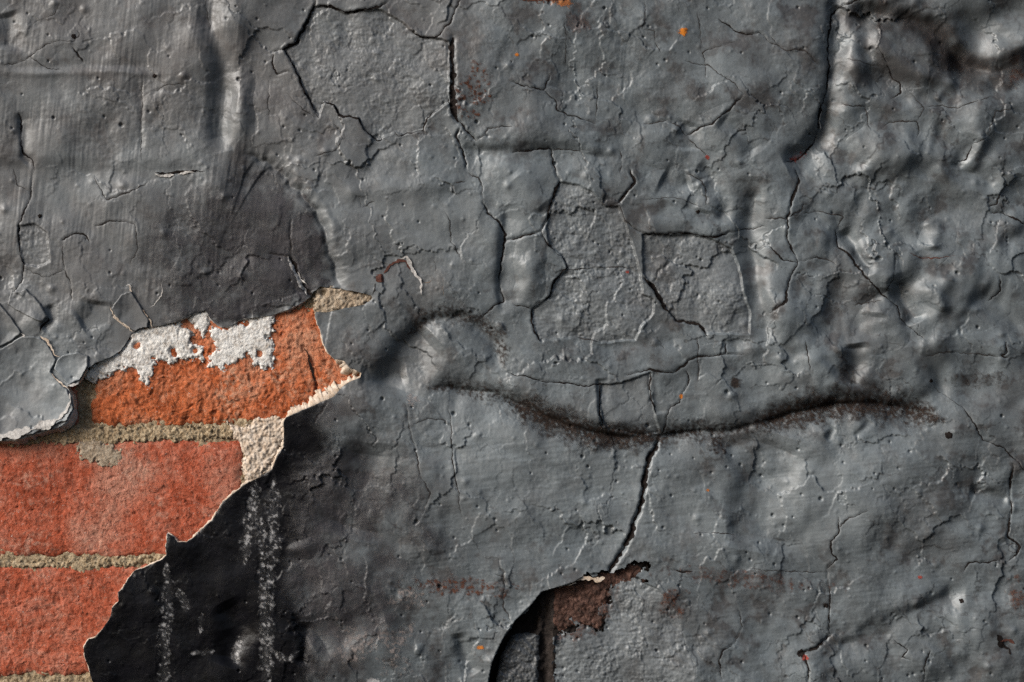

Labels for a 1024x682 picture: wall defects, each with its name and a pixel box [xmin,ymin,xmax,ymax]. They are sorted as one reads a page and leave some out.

crack [4,4,83,70]
crack [13,112,146,299]
crack [267,0,729,573]
crack [606,0,1014,358]
crack [987,195,1024,224]
peeling [0,256,422,590]
damp [512,396,656,449]
damp [753,386,939,429]
crack [937,390,1022,570]
peeling [489,560,696,682]
crack [751,510,868,678]
crack [895,641,930,681]